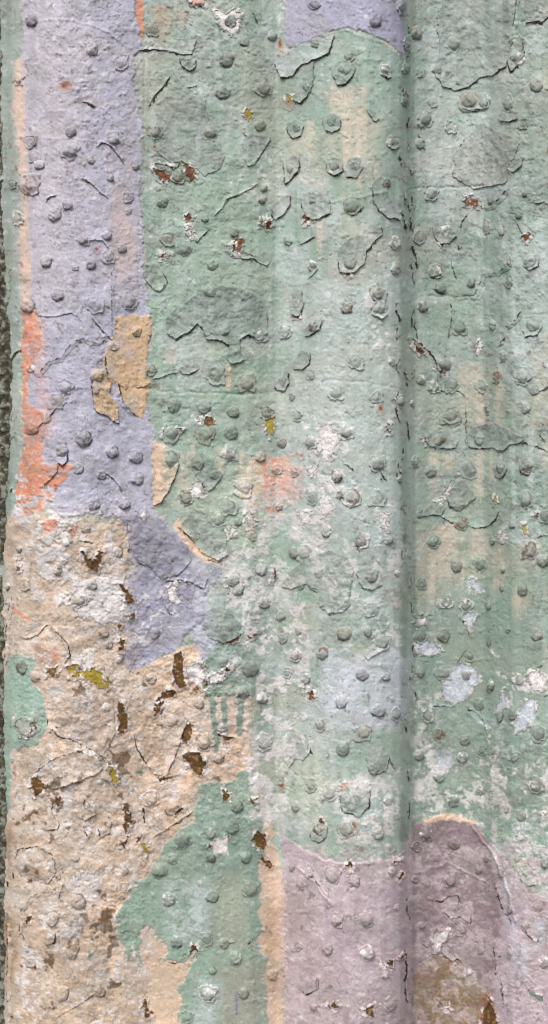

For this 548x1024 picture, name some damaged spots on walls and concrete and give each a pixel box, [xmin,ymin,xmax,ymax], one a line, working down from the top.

crack [139,40,197,108]
peeling [274,33,355,104]
peeling [149,84,225,186]
crack [196,133,271,243]
crack [380,89,514,508]
peeling [129,412,259,605]
peeling [77,547,106,575]
crack [4,596,71,665]
crack [47,714,115,766]
peeling [43,649,236,784]
peeling [26,745,151,859]
crack [139,808,192,838]